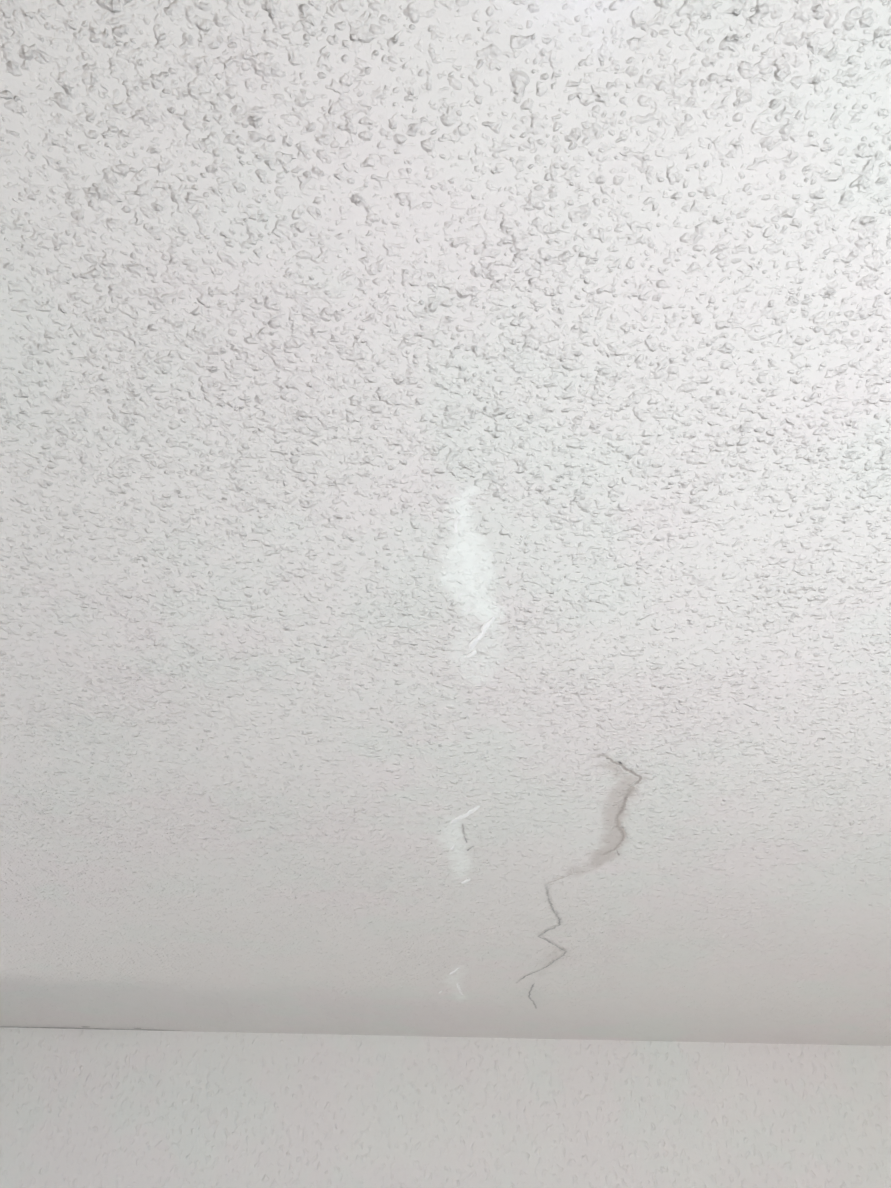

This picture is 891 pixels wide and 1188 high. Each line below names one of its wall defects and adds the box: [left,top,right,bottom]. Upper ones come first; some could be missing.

crack [515,754,654,1009]